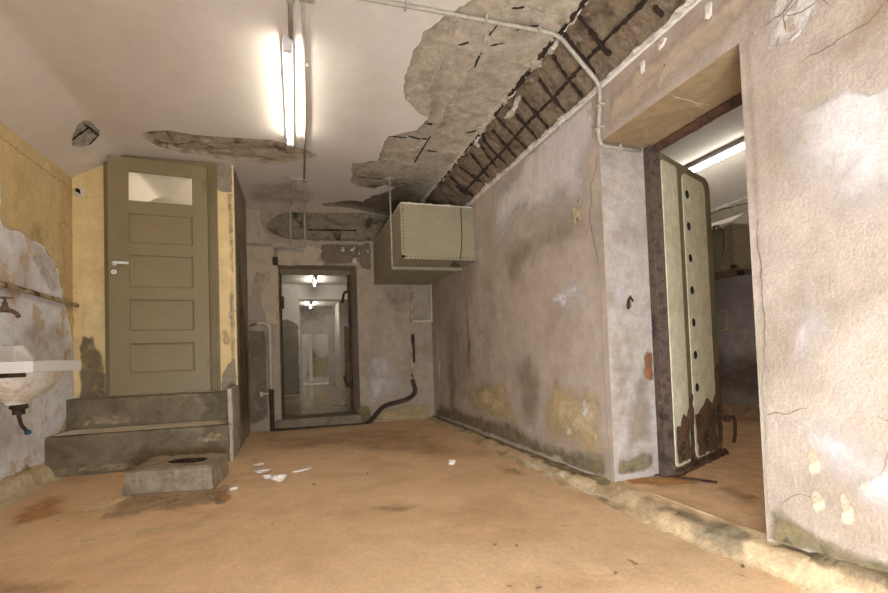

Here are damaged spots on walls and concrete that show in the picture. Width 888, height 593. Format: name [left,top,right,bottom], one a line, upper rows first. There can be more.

peeling [772,0,816,43]
crack [760,0,828,47]
crack [801,0,888,62]
spalling [420,0,697,206]
peeling [0,217,74,481]
corrosion [644,353,653,380]
damp [357,345,611,485]
corrosion [628,363,729,485]
damp [619,454,652,474]